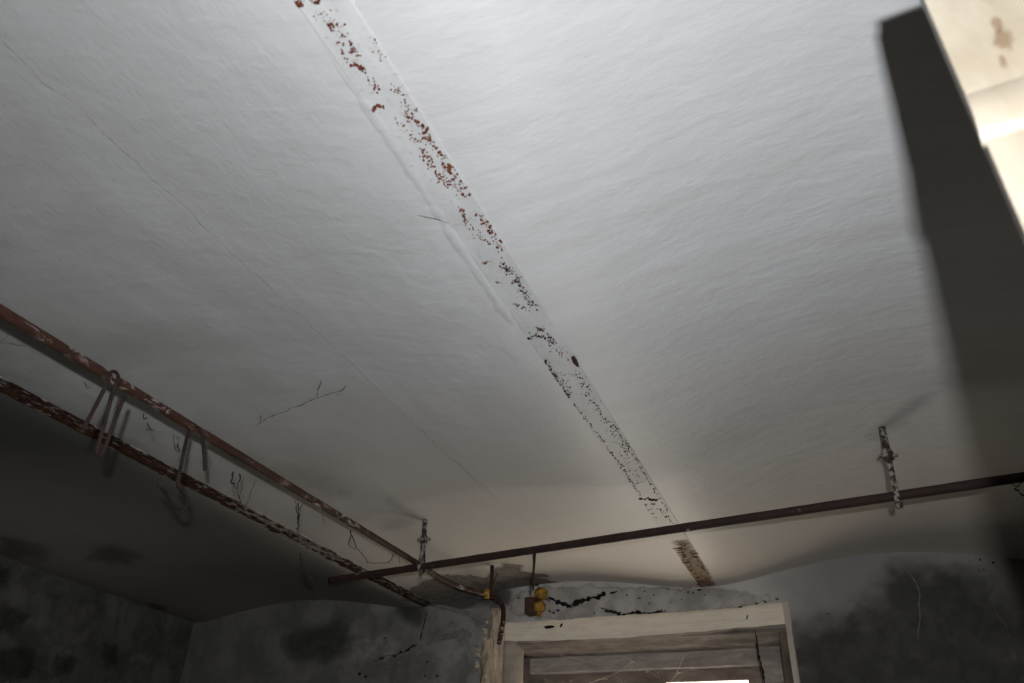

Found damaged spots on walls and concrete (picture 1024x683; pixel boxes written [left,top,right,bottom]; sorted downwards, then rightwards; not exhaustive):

corrosion [294,0,538,312]
crack [2,41,499,500]
corrosion [0,383,429,606]
corrosion [527,327,674,524]
crack [545,591,668,616]
corrosion [673,541,715,587]
damp [796,569,1024,683]